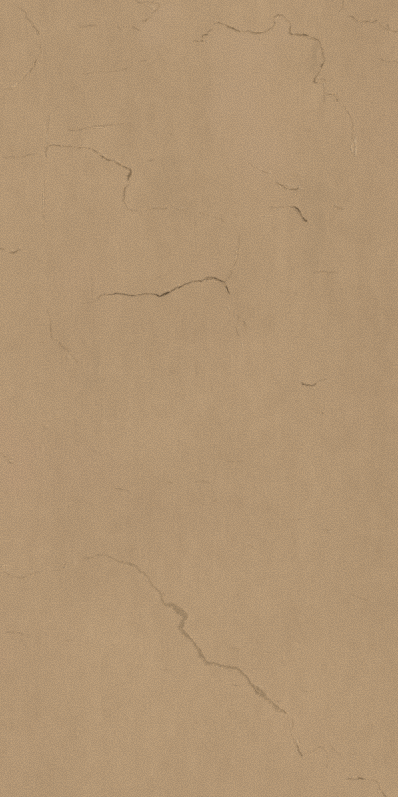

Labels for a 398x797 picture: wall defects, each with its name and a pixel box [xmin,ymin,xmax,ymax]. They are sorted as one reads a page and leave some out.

crack [193,13,357,159]
crack [3,122,225,222]
crack [247,163,308,223]
crack [81,235,247,347]
crack [4,554,304,757]